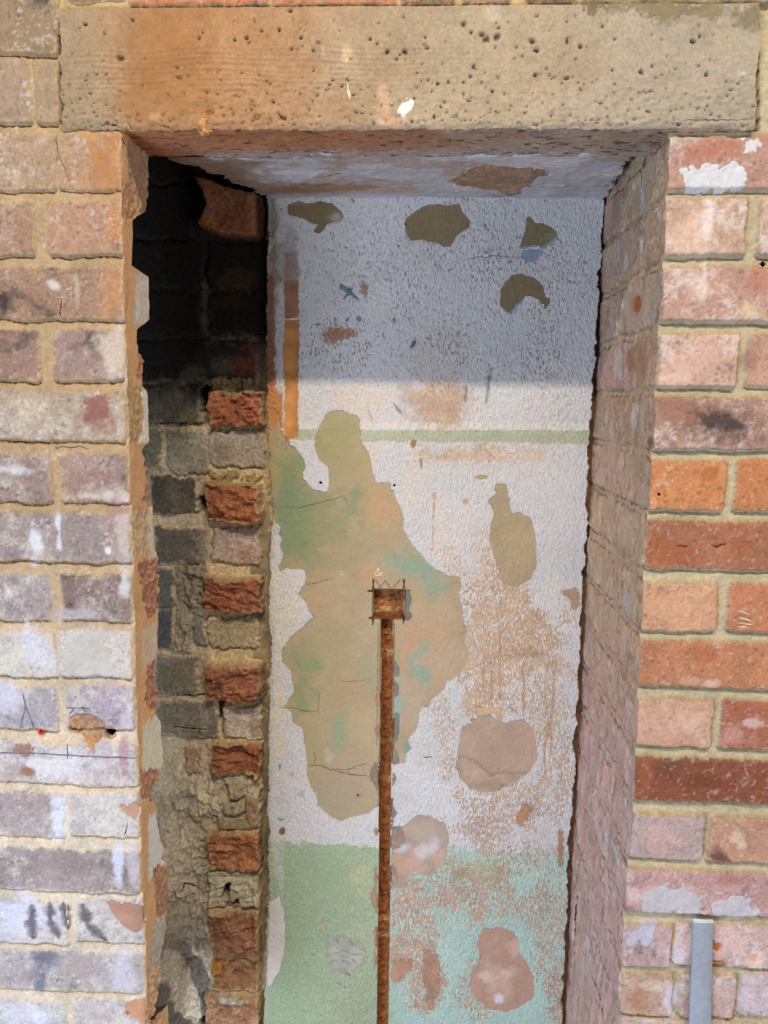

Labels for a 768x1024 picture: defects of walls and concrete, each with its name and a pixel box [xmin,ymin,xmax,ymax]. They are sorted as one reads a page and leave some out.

peeling [288,200,344,235]
peeling [403,204,470,246]
peeling [449,164,548,195]
peeling [520,216,558,262]
peeling [500,274,550,315]
peeling [475,475,538,588]
peeling [269,408,469,821]
peeling [456,706,538,792]
peeling [391,798,449,904]
peeling [470,927,534,1012]